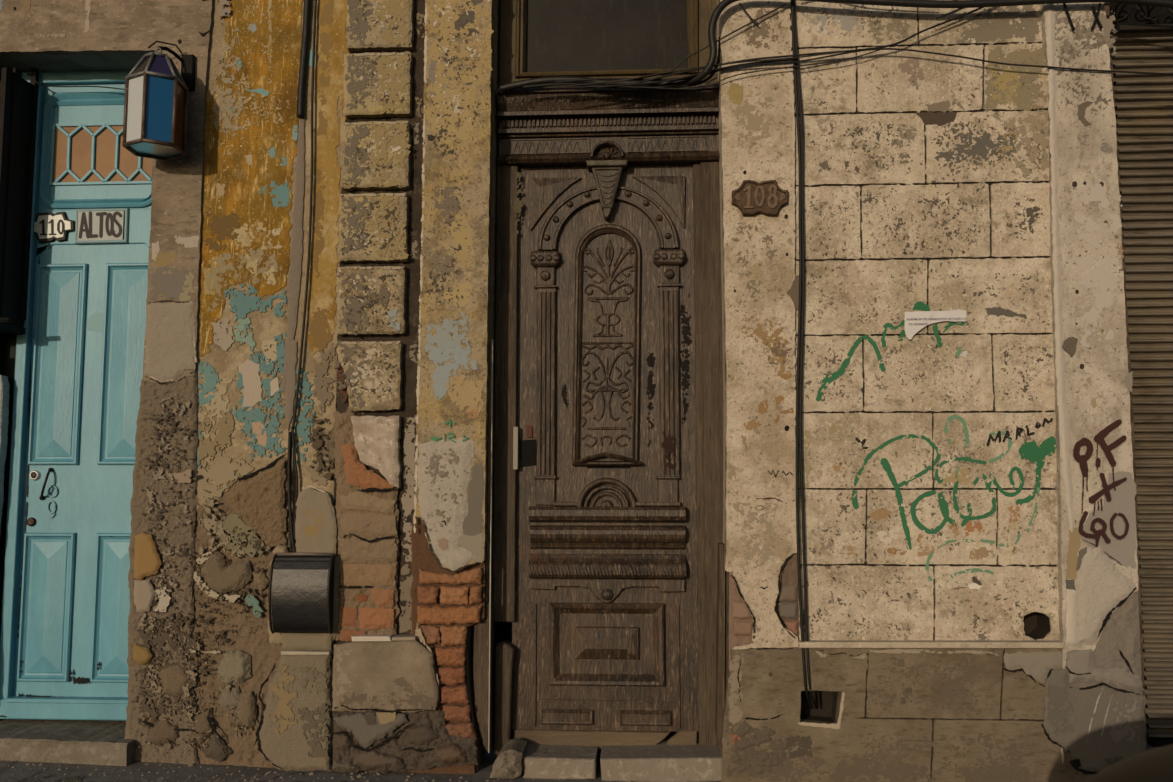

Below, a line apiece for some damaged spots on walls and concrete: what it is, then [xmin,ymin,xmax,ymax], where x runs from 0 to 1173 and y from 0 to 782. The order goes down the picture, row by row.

spalling [454,0,483,31]
peeling [208,0,298,209]
peeling [349,59,437,180]
spalling [124,179,485,774]
spalling [729,572,754,666]
spalling [776,553,811,638]
peeling [1065,547,1087,645]
spalling [1070,591,1142,695]